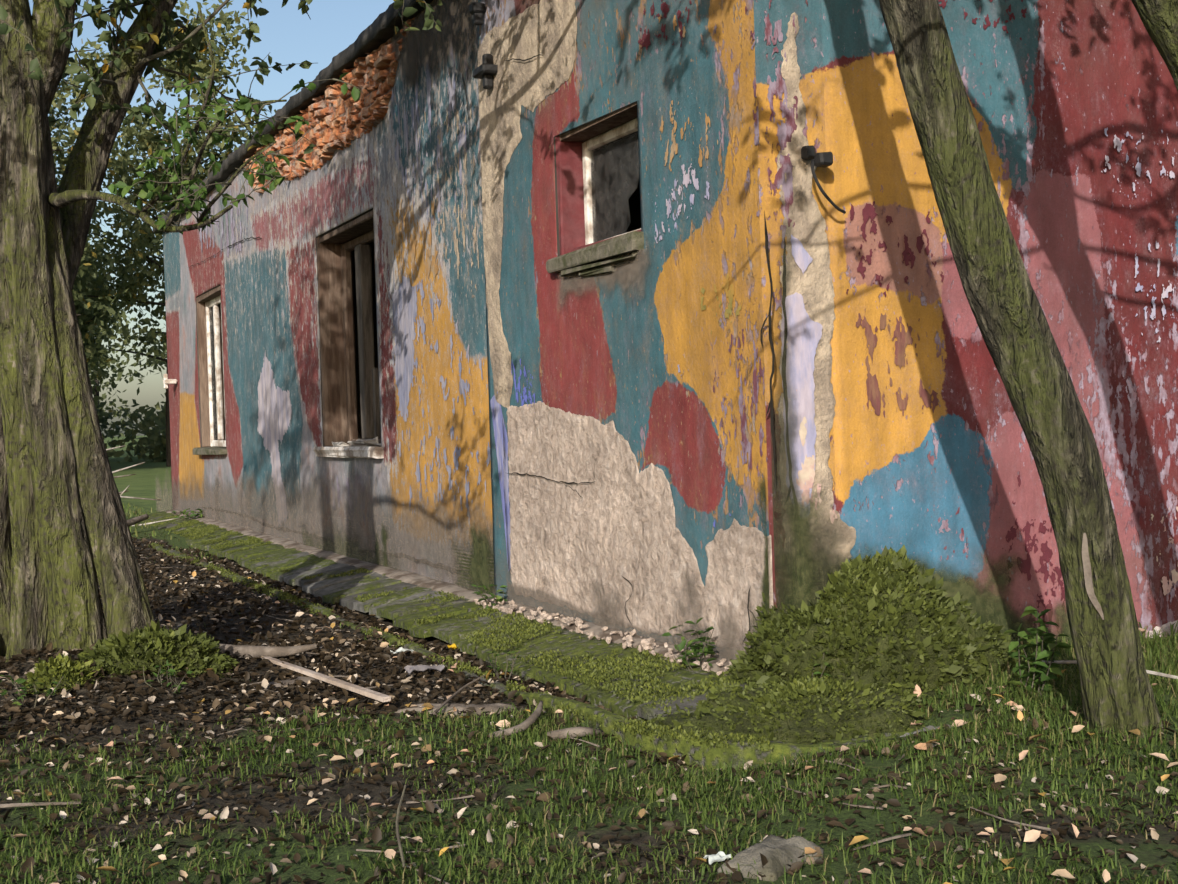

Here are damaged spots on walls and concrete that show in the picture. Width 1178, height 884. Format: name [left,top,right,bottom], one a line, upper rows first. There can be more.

peeling [964,0,1032,99]
peeling [1101,128,1175,201]
spalling [196,0,856,655]
peeling [850,201,944,297]
peeling [856,309,939,418]
peeling [1122,347,1139,410]
peeling [1134,241,1176,350]
crack [502,417,595,569]
peeling [1151,506,1178,597]